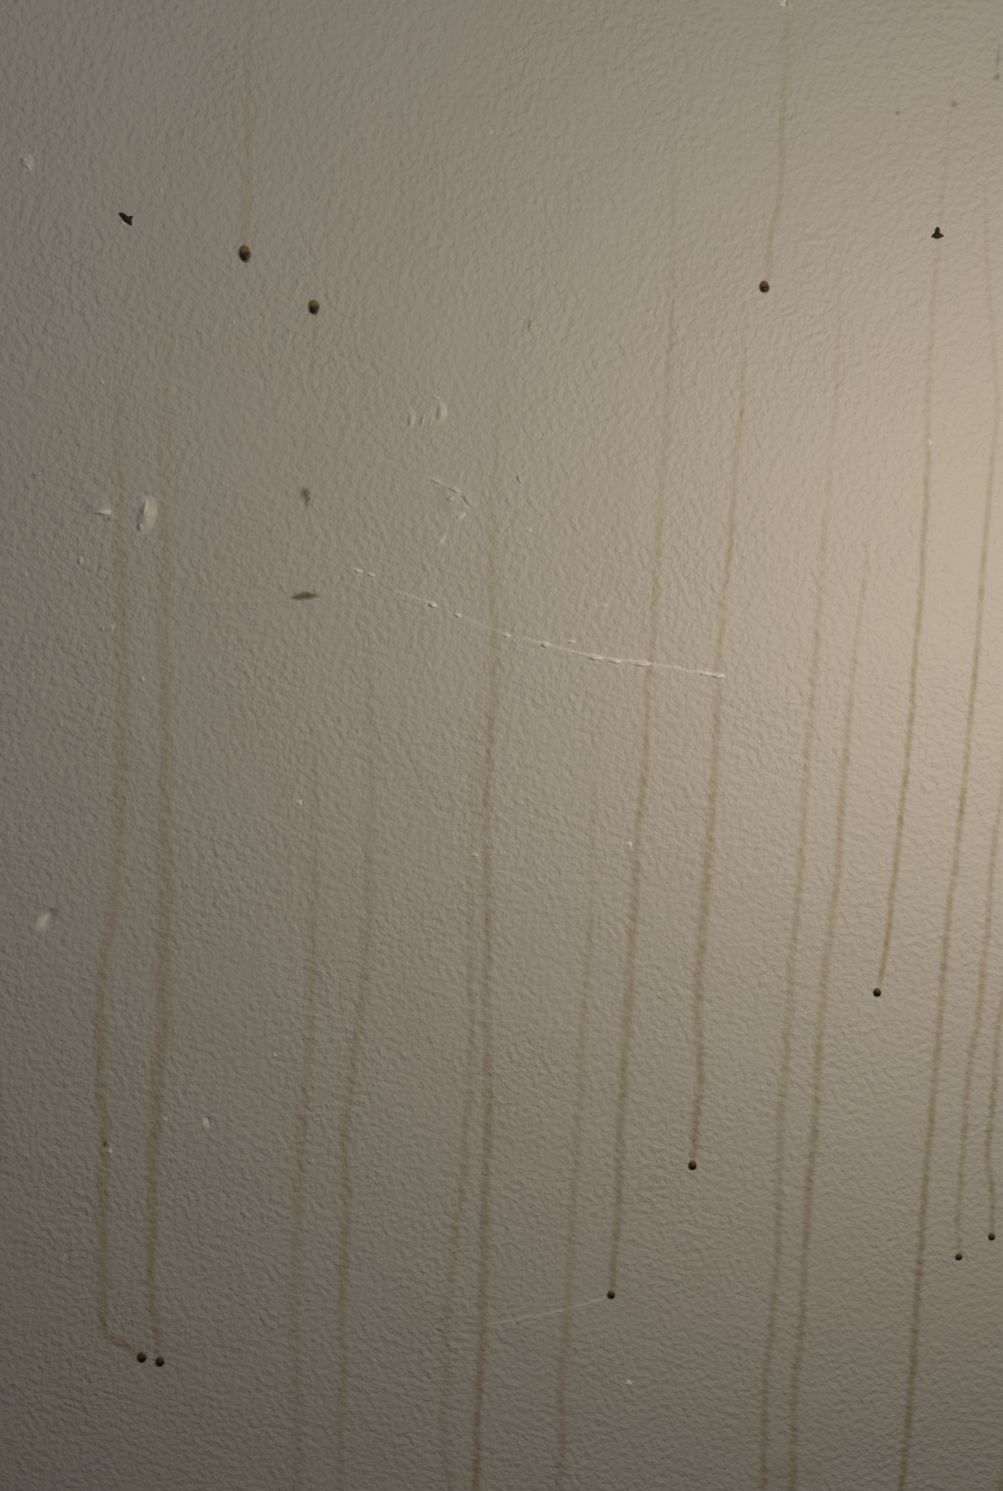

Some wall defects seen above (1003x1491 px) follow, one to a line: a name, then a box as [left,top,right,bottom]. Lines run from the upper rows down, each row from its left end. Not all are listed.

water stain [138,1353,164,1367]